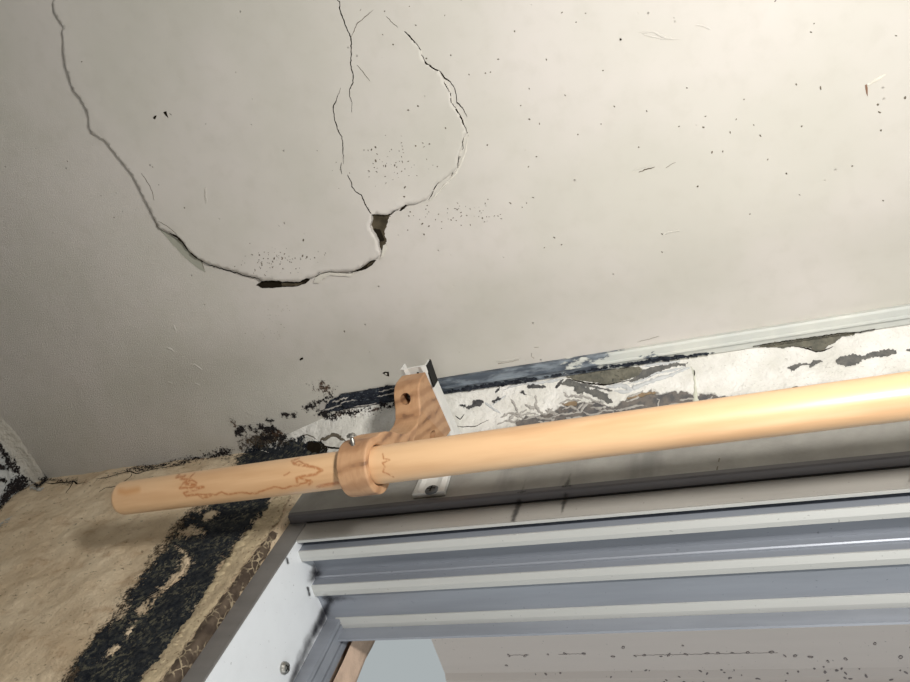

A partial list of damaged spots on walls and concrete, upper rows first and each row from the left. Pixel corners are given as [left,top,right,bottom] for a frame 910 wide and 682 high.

crack [333,0,469,216]
crack [141,173,261,281]
spalling [456,361,690,427]
spalling [753,329,875,372]
peeling [836,348,910,367]
damp [0,412,346,510]
damp [61,497,271,682]